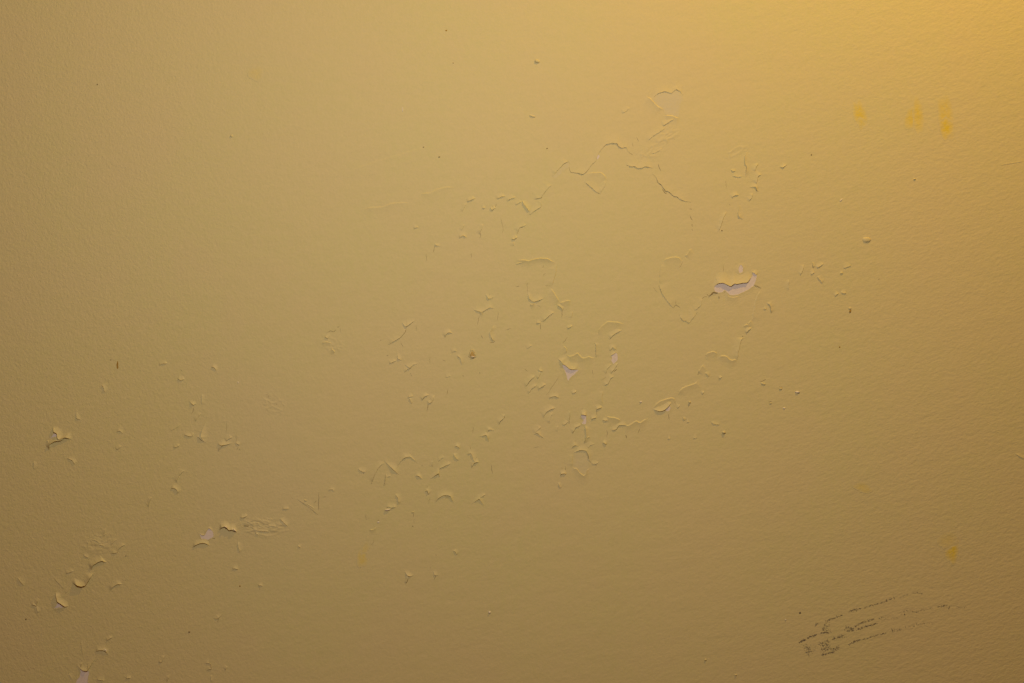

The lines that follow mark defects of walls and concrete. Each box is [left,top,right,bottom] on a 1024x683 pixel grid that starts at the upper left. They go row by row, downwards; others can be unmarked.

peeling [679,262,761,323]